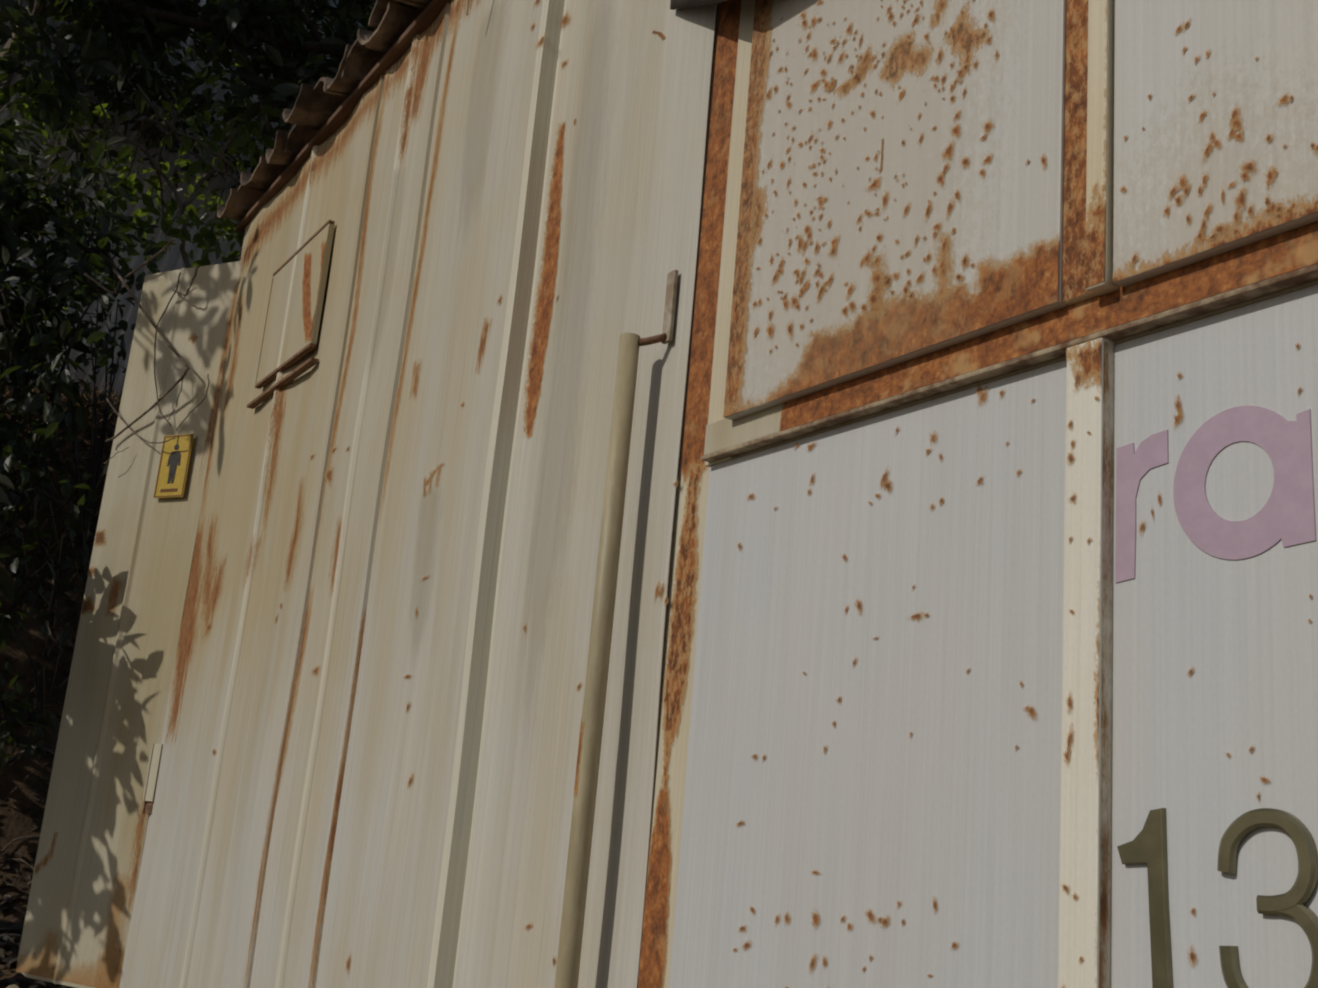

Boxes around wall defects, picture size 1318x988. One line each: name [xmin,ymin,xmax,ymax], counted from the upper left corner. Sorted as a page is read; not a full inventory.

corrosion [167,0,481,737]
corrosion [476,320,491,372]
corrosion [524,119,575,438]
corrosion [638,0,1318,988]
corrosion [16,880,126,988]
corrosion [245,595,319,984]
corrosion [308,615,365,988]